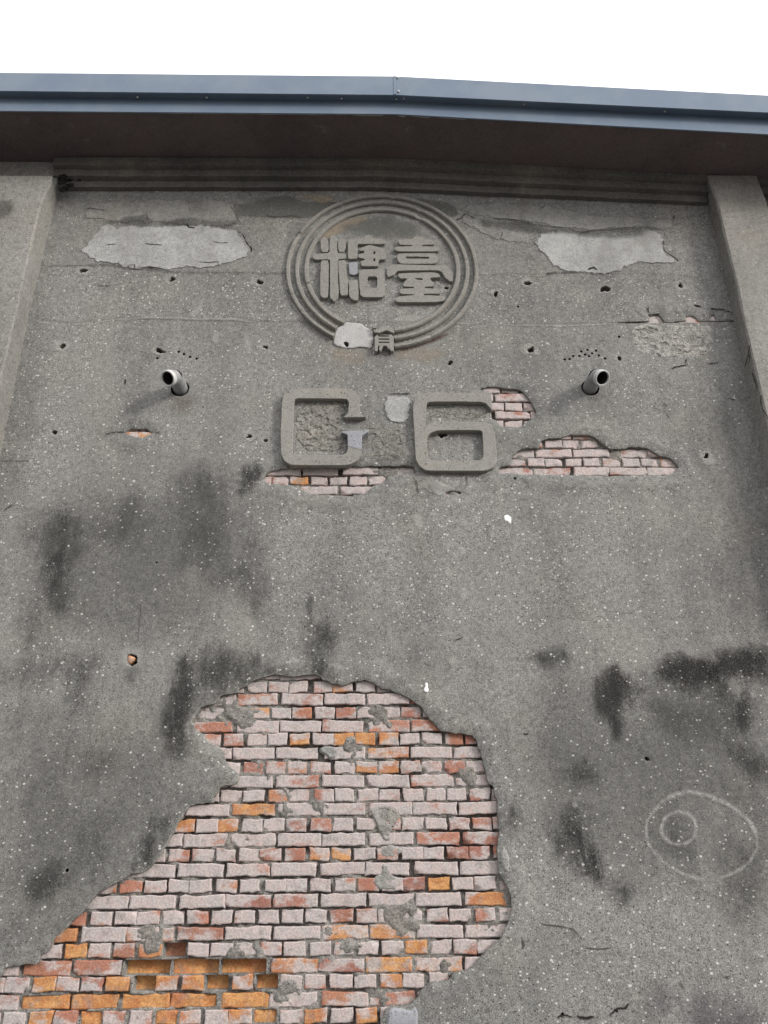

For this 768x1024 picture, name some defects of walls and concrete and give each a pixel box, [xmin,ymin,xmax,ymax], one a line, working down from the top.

flaking render [481,386,536,427]
damp [239,464,261,493]
flaking render [262,465,462,497]
flaking render [498,435,679,480]
damp [31,512,81,612]
damp [160,650,261,759]
damp [594,664,643,740]
damp [656,643,768,732]
flaking render [0,674,512,1024]
damp [549,808,631,902]
damp [645,790,758,854]